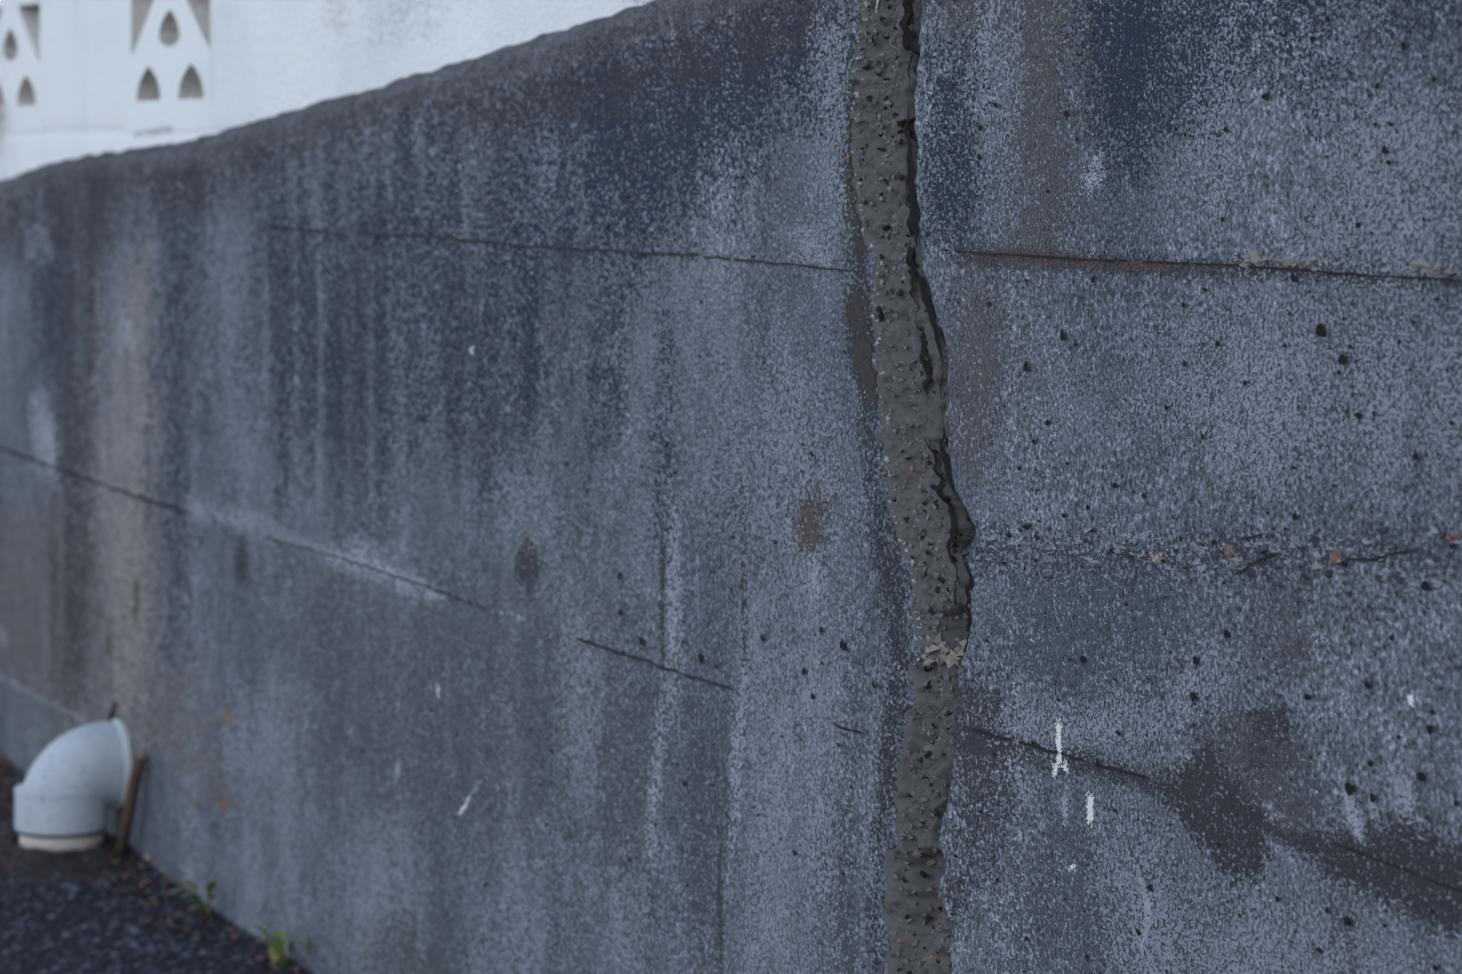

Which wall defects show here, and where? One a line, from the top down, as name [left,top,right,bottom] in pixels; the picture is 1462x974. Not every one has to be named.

crack [944,249,1462,282]
water stain [0,0,913,974]
crack [265,0,1150,974]
crack [1233,533,1281,576]
crack [1332,550,1415,566]
water stain [940,545,1462,974]
crack [1332,843,1462,892]